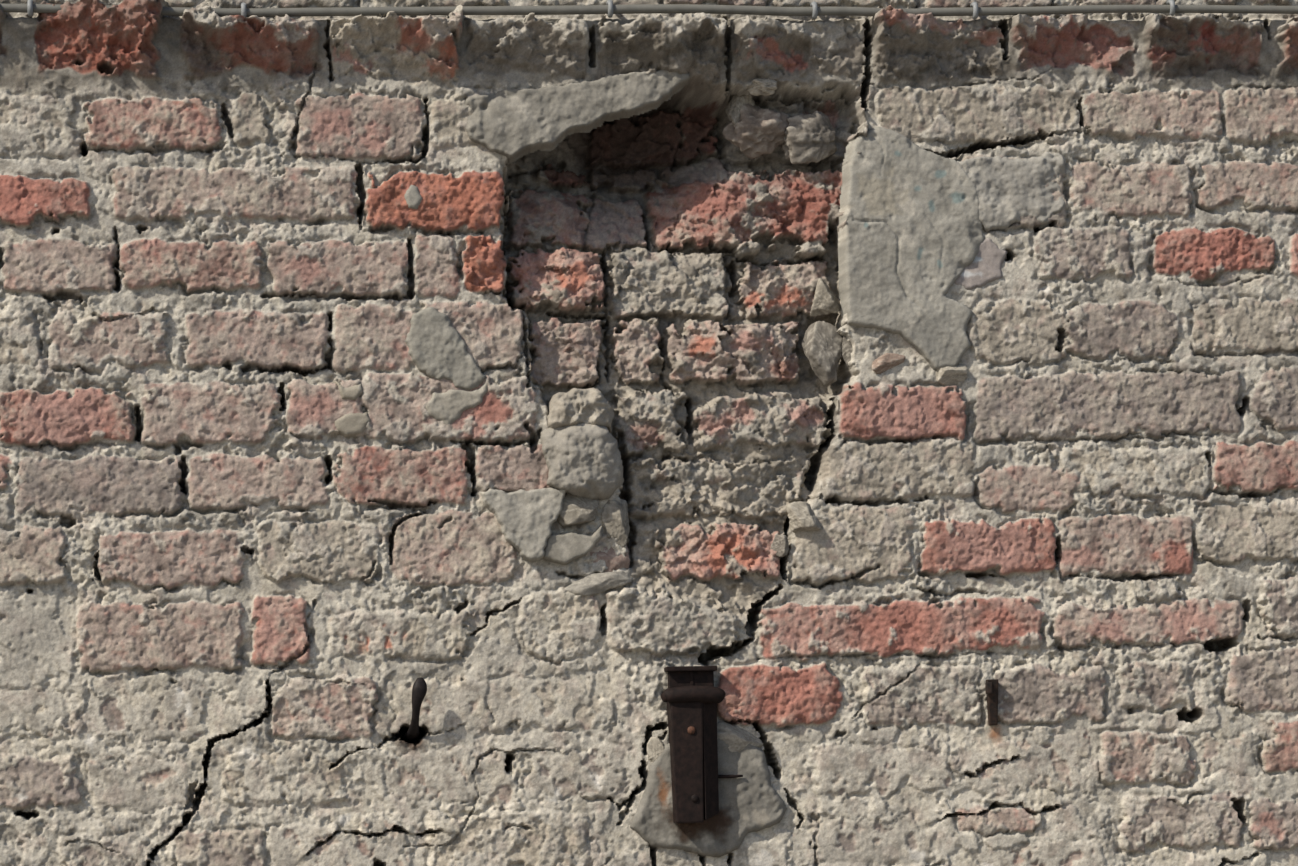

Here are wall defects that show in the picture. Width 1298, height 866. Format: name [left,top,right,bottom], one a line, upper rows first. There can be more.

crack [925,128,1096,159]
spalling [502,79,867,621]
crack [803,397,839,492]
crack [697,516,793,666]
crack [65,599,373,866]
crack [304,722,564,856]
crack [724,717,822,866]
crack [936,754,1061,822]
crack [697,853,735,866]